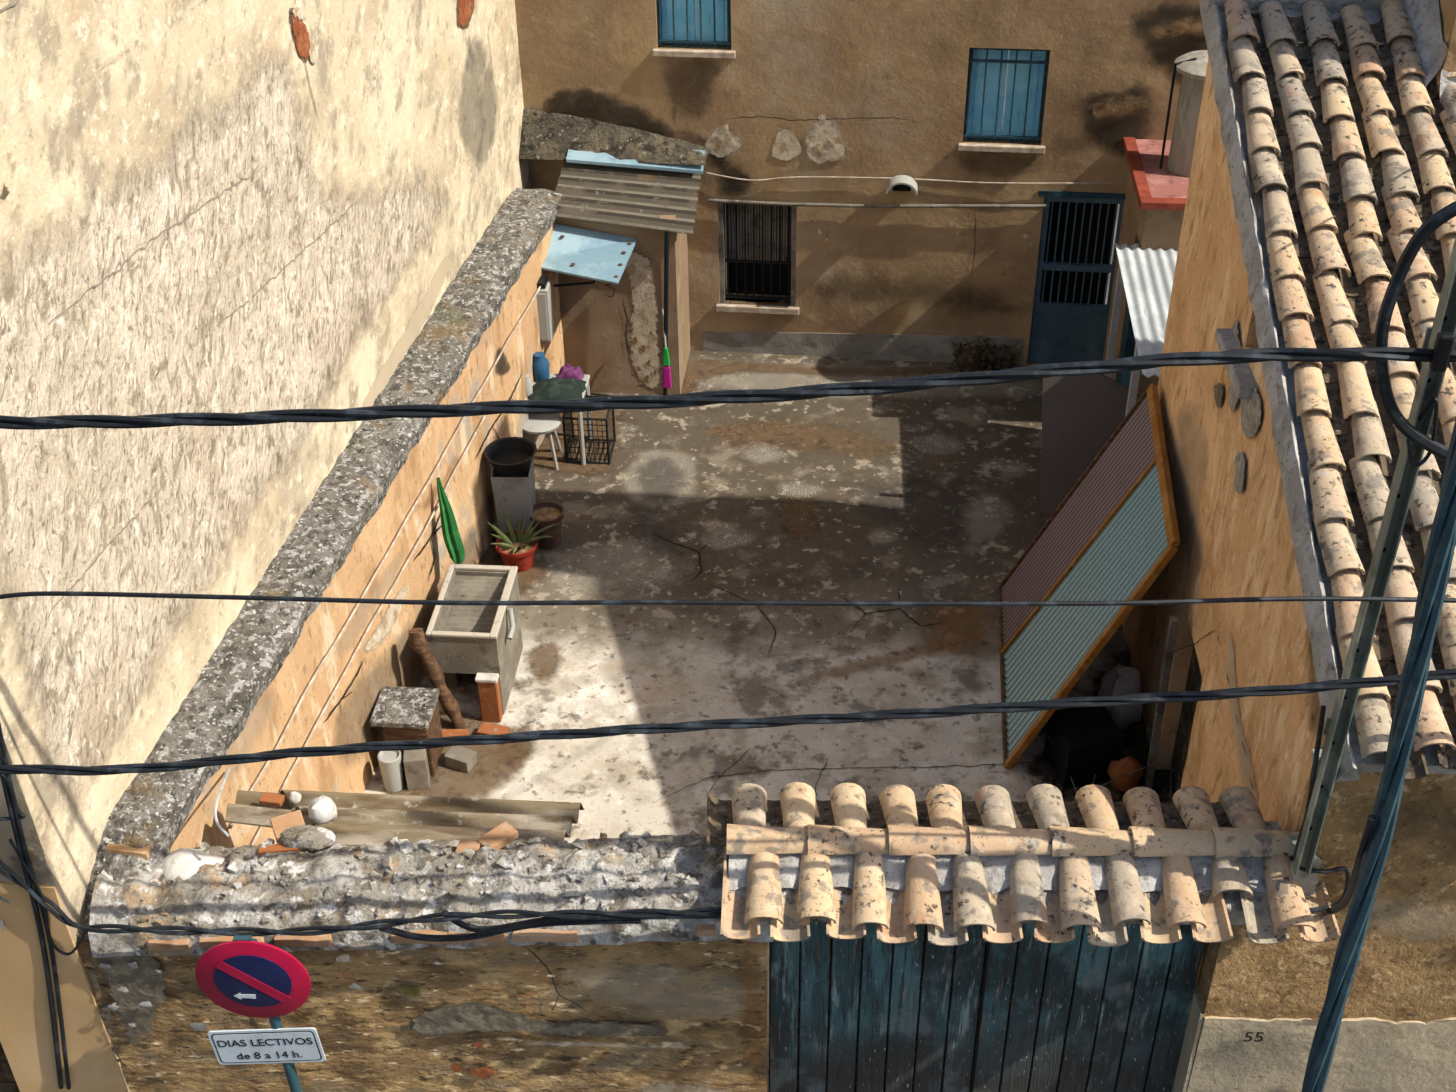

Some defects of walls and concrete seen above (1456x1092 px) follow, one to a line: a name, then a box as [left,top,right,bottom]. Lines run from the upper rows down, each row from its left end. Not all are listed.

flaking render [456,0,475,30]
flaking render [705,124,742,158]
flaking render [772,114,845,164]
crack [652,533,776,653]
crack [842,587,955,632]
flaking render [409,1001,686,1079]